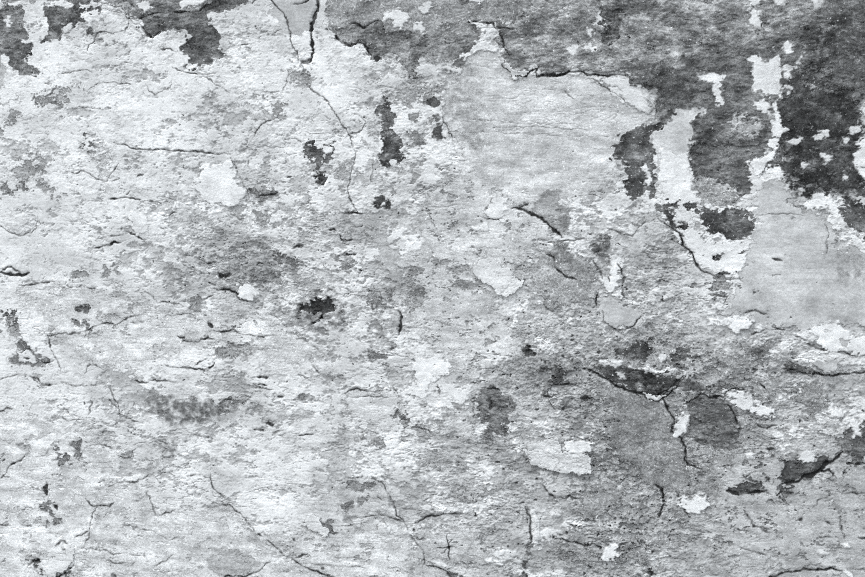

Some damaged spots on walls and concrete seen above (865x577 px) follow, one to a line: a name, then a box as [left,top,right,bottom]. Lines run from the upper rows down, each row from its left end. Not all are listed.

crack [253,0,319,58]
crack [335,21,375,55]
spalling [0,0,248,136]
peeling [0,151,67,202]
peeling [79,133,117,177]
peeling [193,160,278,227]
crack [309,87,364,255]
peeling [128,207,150,236]
spalling [236,249,299,302]
peeling [0,270,324,371]
spalling [211,395,252,417]